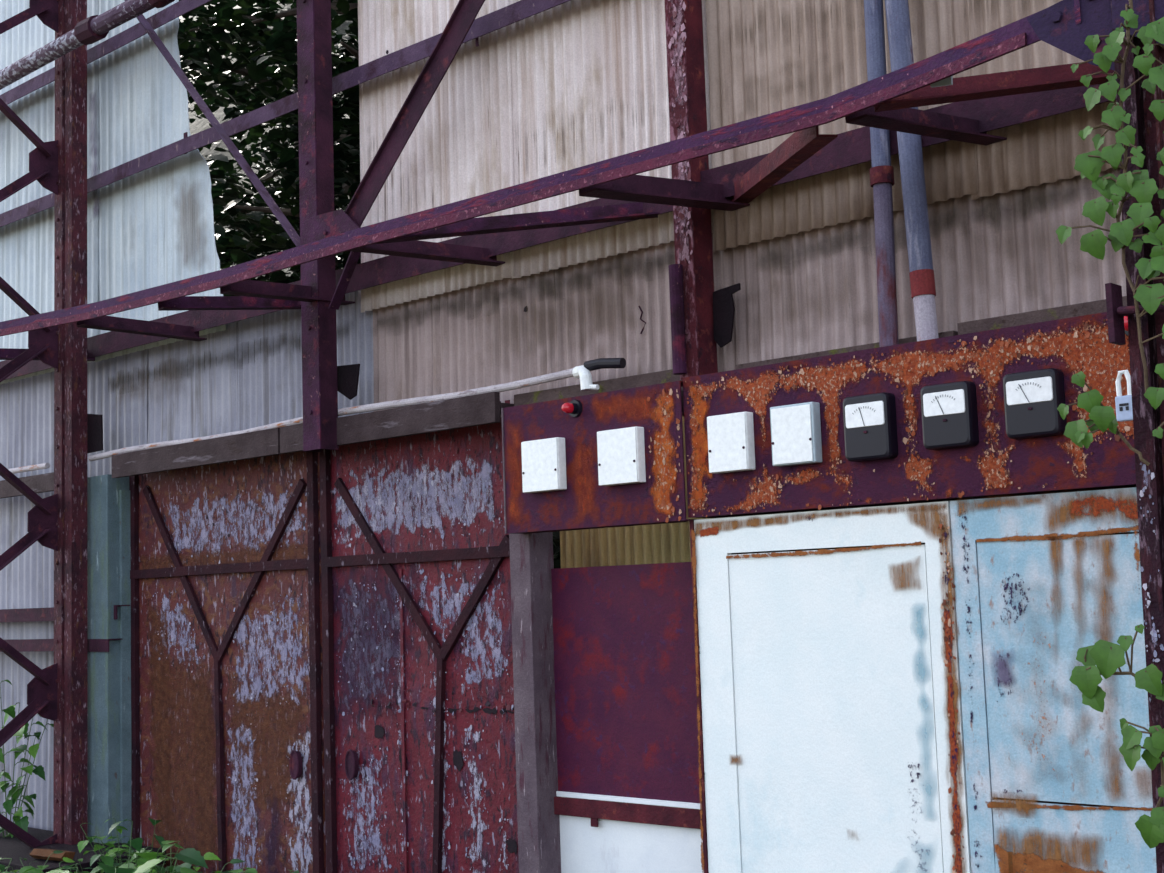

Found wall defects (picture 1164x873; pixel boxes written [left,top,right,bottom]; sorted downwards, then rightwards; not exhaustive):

peeling [157,478,307,564]
peeling [332,447,505,547]
rust [507,429,522,519]
peeling [153,590,205,673]
rust [593,319,1153,873]
rust [231,684,302,812]
peeling [227,586,313,873]
peeling [334,566,509,873]